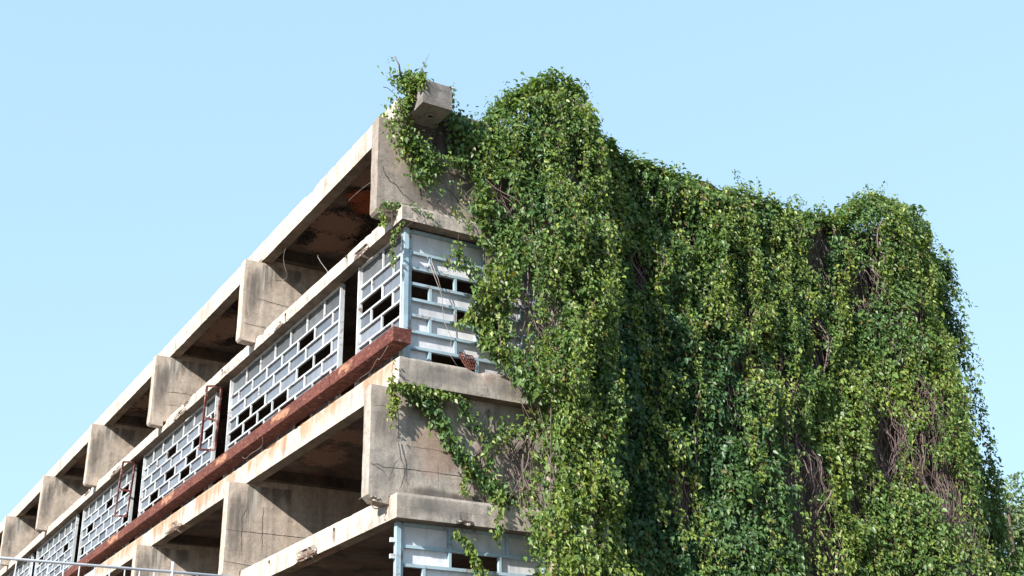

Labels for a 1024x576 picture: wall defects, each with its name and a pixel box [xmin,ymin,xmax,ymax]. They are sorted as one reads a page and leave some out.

damp [296,184,381,248]